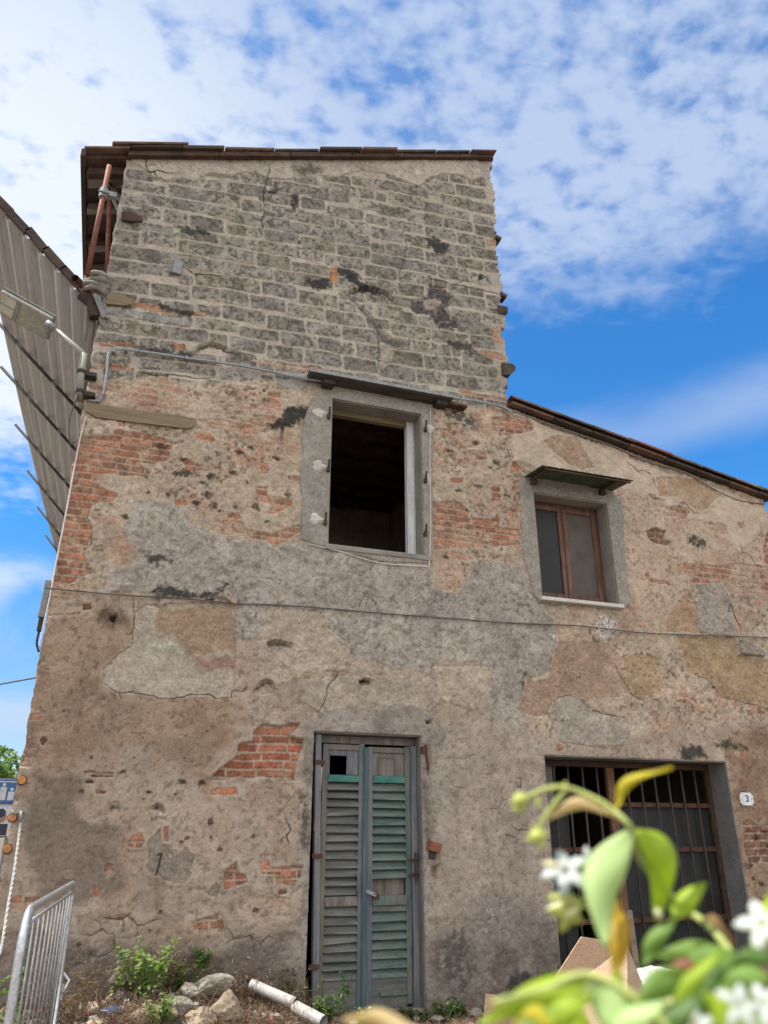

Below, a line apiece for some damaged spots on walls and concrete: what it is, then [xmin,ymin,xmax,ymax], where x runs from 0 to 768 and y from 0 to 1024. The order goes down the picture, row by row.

crack [262,165,270,235]
water stain [426,236,449,254]
water stain [306,267,381,295]
water stain [267,405,308,435]
spalling [45,430,300,627]
spalling [433,478,522,559]
spalling [646,528,669,546]
peeling [102,602,236,698]
spalling [175,719,302,795]
spalling [205,863,246,901]
spalling [743,819,768,904]
crack [73,912,160,967]